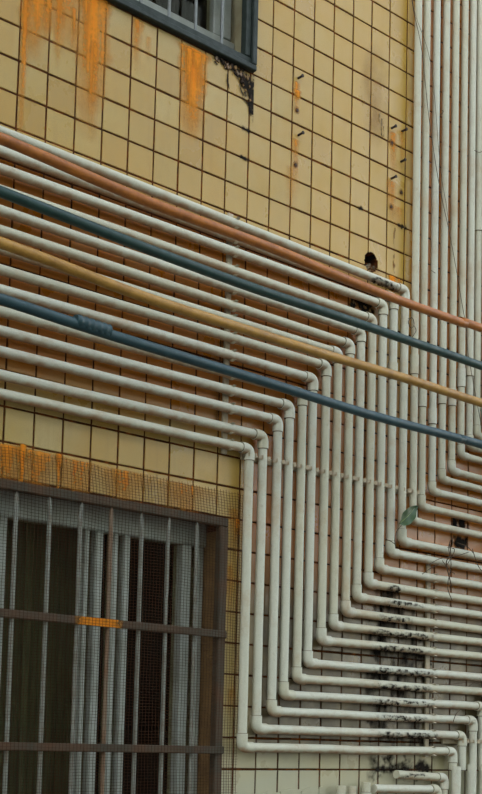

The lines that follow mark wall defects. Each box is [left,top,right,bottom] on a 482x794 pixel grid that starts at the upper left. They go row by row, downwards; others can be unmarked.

corrosion [21,0,109,95]
corrosion [179,43,208,121]